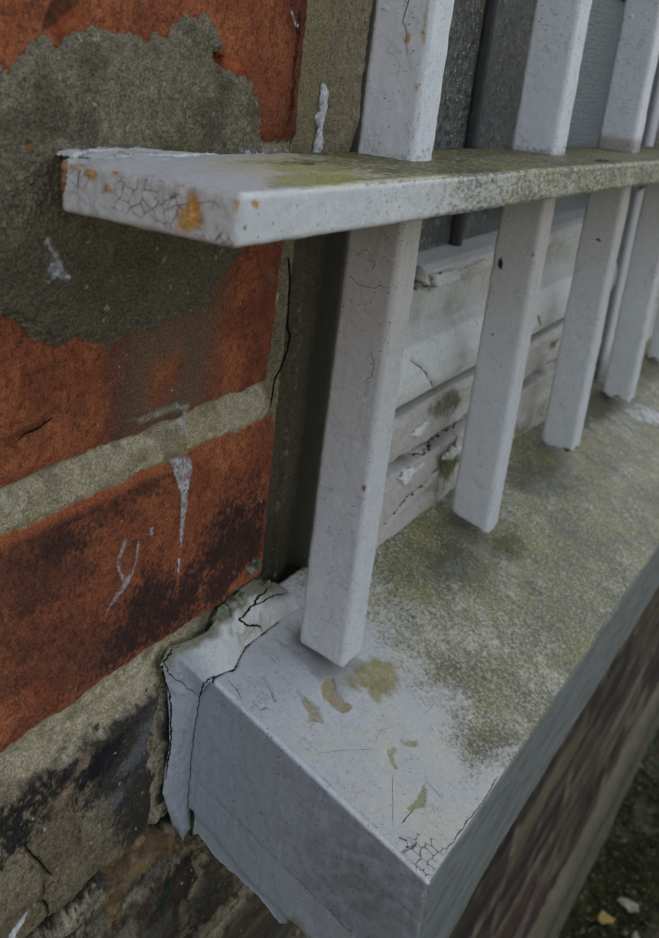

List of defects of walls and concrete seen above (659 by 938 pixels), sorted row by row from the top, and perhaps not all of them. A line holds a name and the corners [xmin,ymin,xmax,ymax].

peeling [56,147,219,158]
crack [113,181,214,224]
corrosion [178,193,201,230]
crack [268,257,291,413]
crack [14,417,52,443]
water stain [583,391,612,428]
water stain [624,403,659,426]
peeling [442,445,462,460]
peeling [396,462,425,485]
crack [160,586,293,823]
peeling [320,679,351,713]
crack [399,776,498,876]